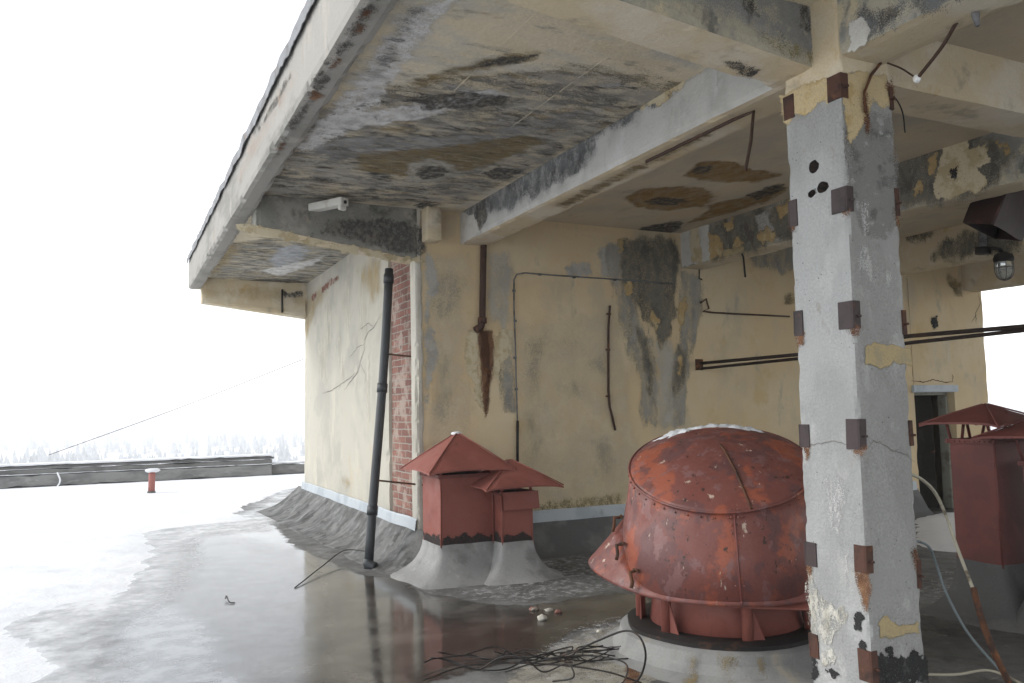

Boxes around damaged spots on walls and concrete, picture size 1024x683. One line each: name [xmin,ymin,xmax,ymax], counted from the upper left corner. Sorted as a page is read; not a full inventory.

peeling [779,77,828,126]
peeling [842,62,890,144]
water stain [208,0,711,431]
spalling [808,160,829,198]
peeling [911,140,1011,202]
water stain [604,160,794,430]
corrosion [477,329,496,419]
crack [811,440,913,461]
peeling [805,565,867,667]